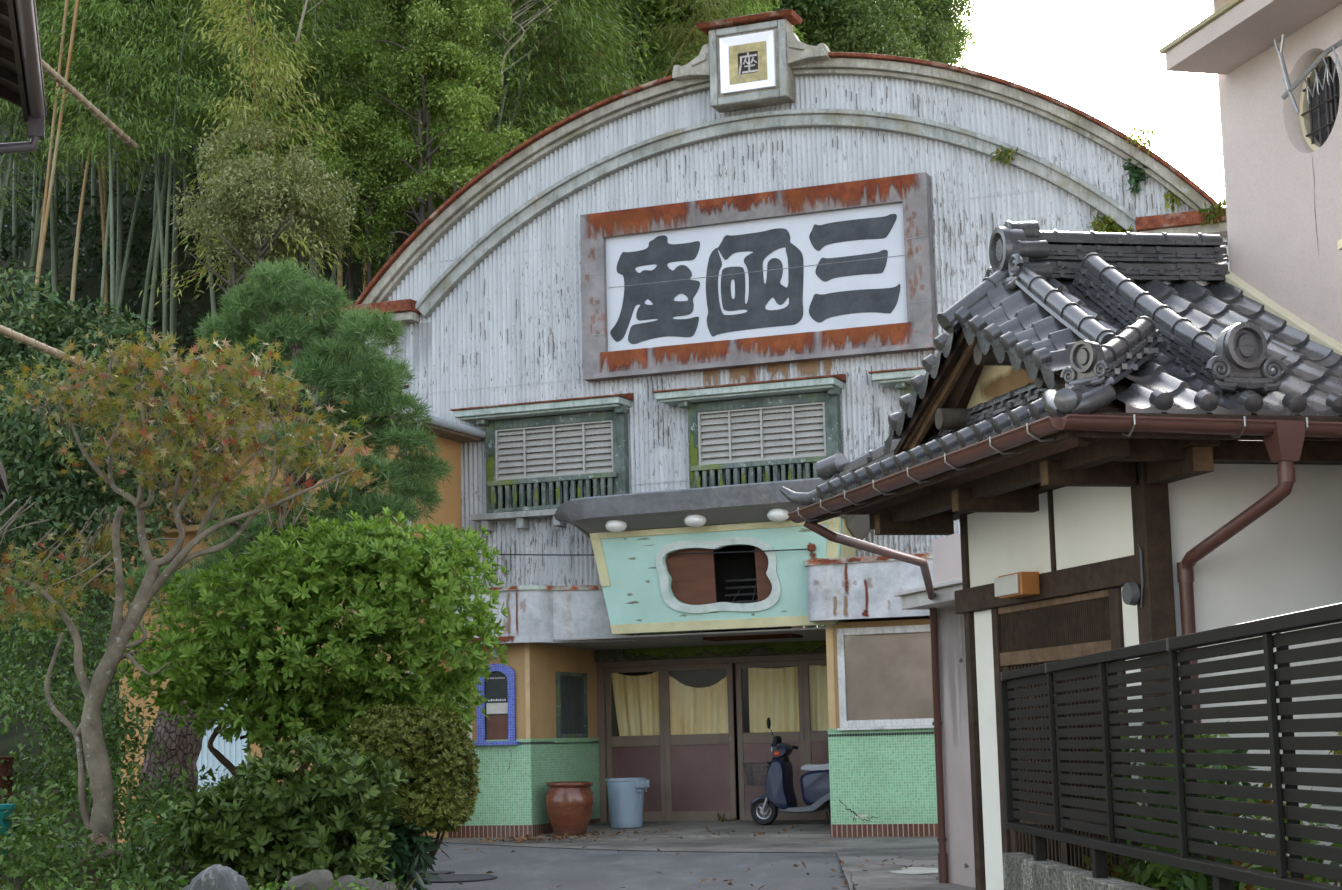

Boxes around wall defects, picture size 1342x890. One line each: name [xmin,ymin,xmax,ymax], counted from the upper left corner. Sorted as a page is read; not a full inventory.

corrosion [587,173,917,237]
corrosion [600,322,911,386]
corrosion [807,543,869,617]